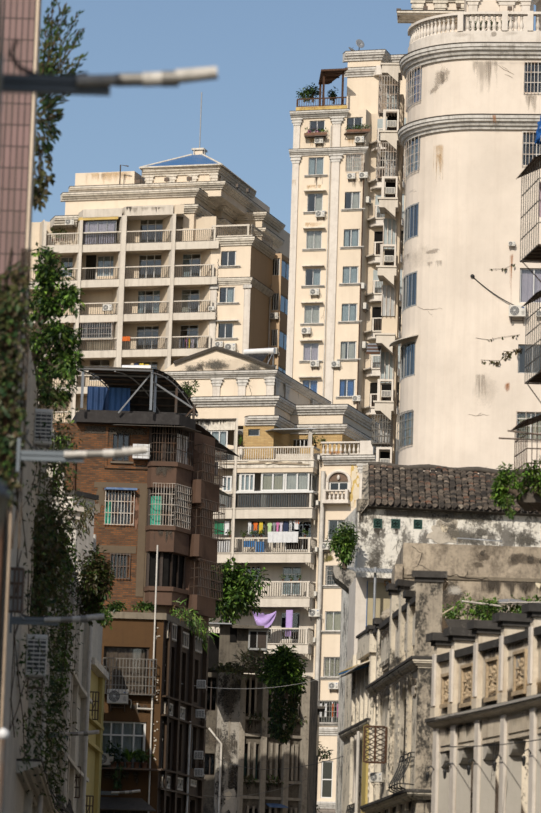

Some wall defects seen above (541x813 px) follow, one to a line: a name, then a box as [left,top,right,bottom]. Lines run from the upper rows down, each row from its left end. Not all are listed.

water stain [359,511,382,537]
water stain [367,548,383,567]
water stain [383,509,492,567]
crack [394,542,499,581]
water stain [510,531,541,564]
water stain [222,680,241,719]
water stain [206,726,257,791]